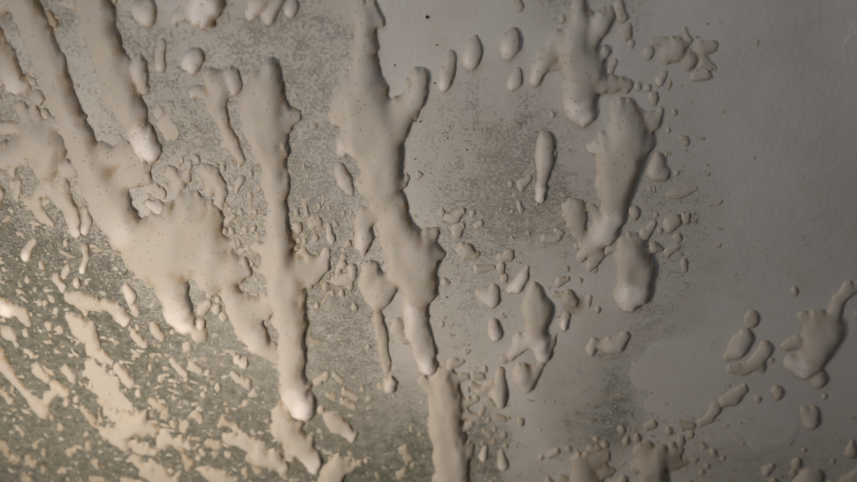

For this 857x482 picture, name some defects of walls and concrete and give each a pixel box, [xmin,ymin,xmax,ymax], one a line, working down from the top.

damp [0,0,507,482]
damp [444,100,565,256]
damp [676,383,748,430]